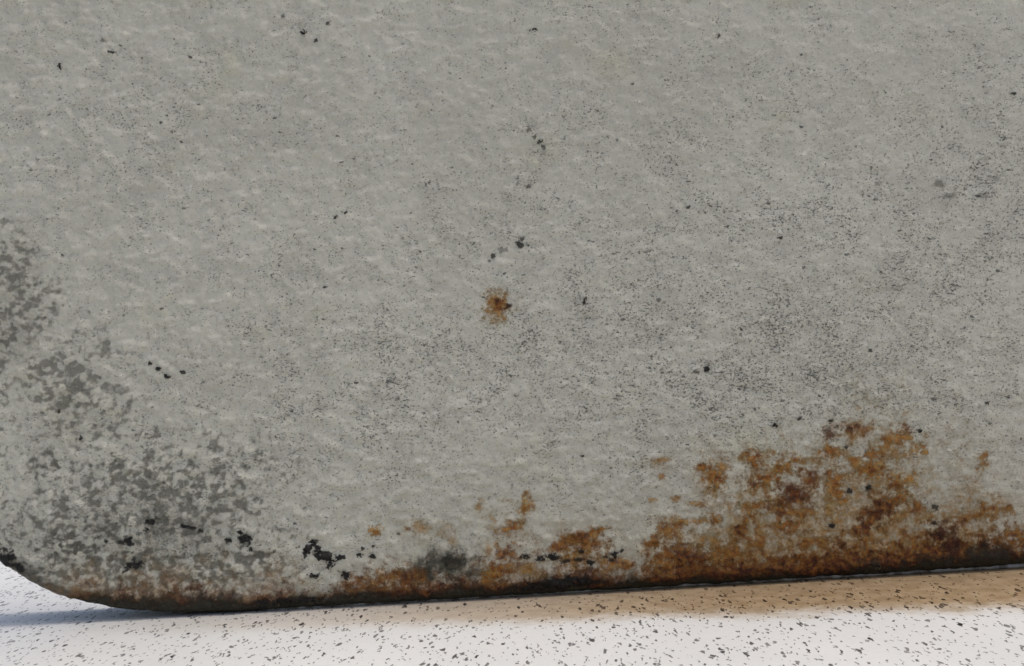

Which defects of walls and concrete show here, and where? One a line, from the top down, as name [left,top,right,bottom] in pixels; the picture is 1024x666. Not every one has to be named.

corrosion [485,293,512,320]
corrosion [319,423,1024,599]